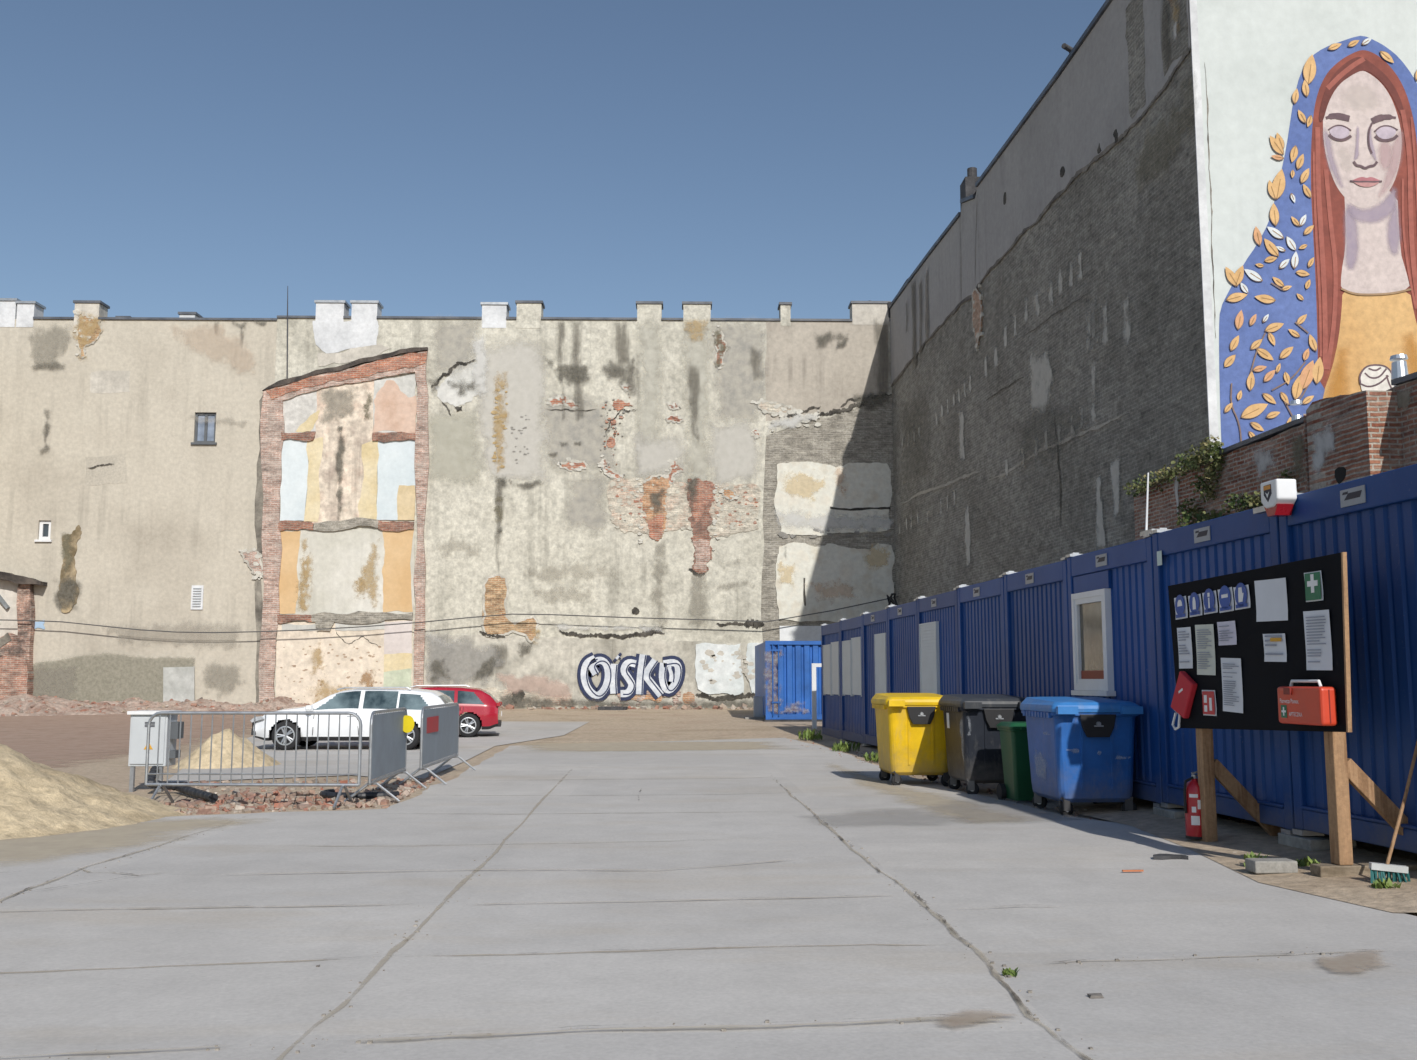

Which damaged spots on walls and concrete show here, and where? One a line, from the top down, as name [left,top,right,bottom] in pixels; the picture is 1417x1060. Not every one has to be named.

flaking render [73,310,103,359]
flaking render [431,359,479,415]
spalling [557,382,761,576]
spalling [777,528,890,539]
spalling [55,525,82,613]
flaking render [479,574,539,643]